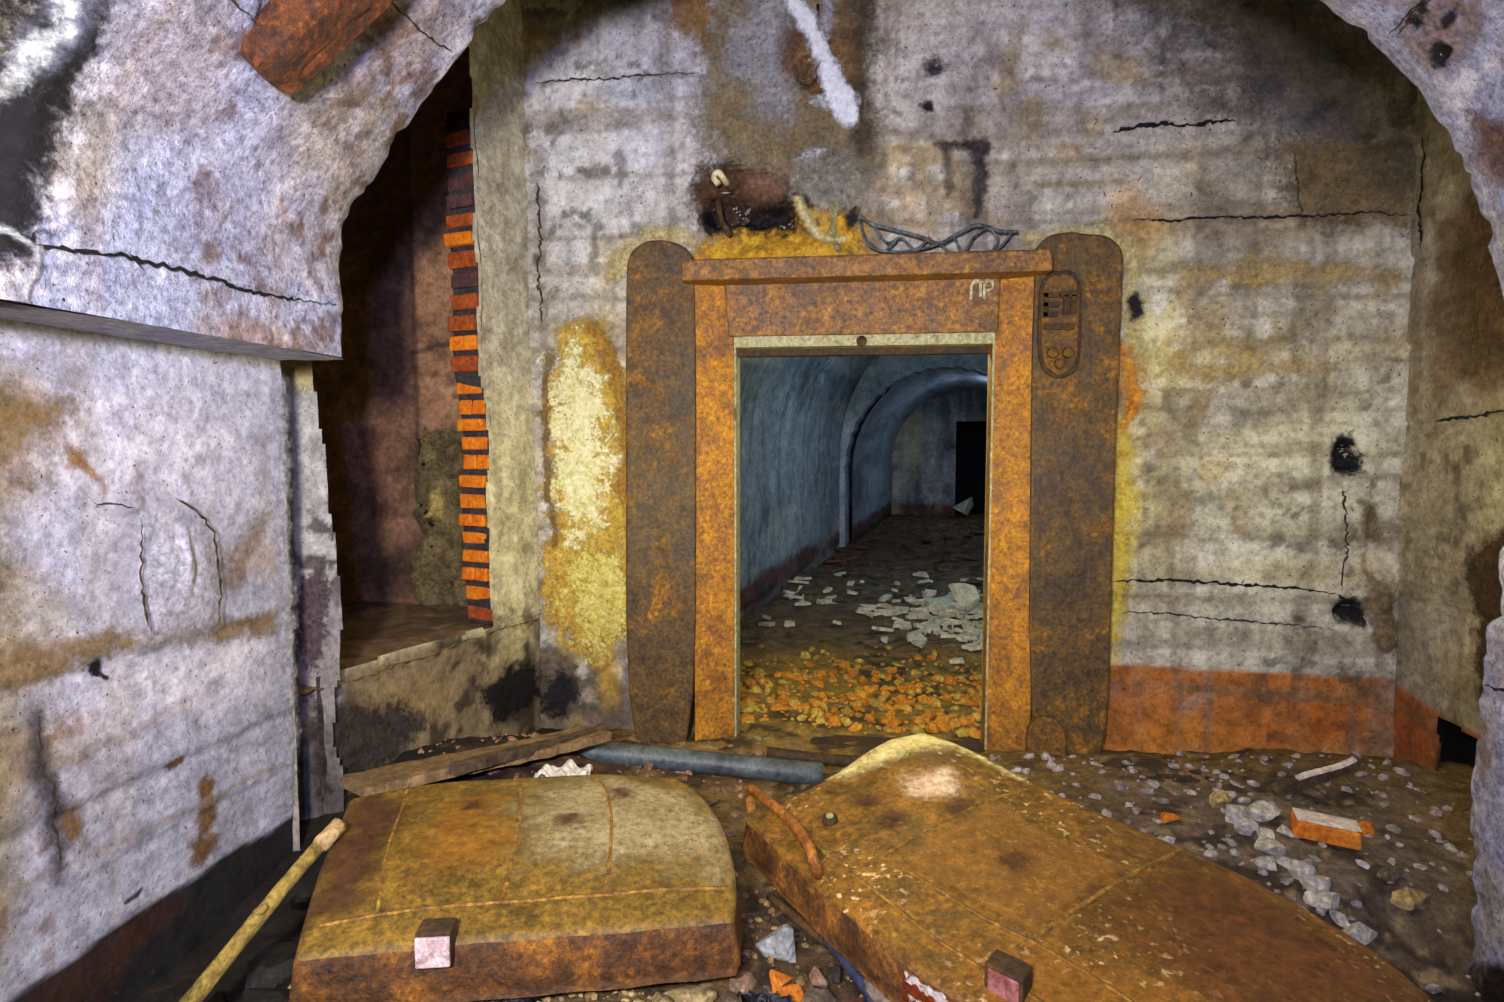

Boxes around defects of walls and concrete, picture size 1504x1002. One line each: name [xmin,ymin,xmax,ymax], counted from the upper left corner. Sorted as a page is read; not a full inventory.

damp [0,0,110,309]
crack [0,225,335,305]
damp [1461,530,1504,705]
damp [30,710,65,884]
corrosion [191,776,218,864]